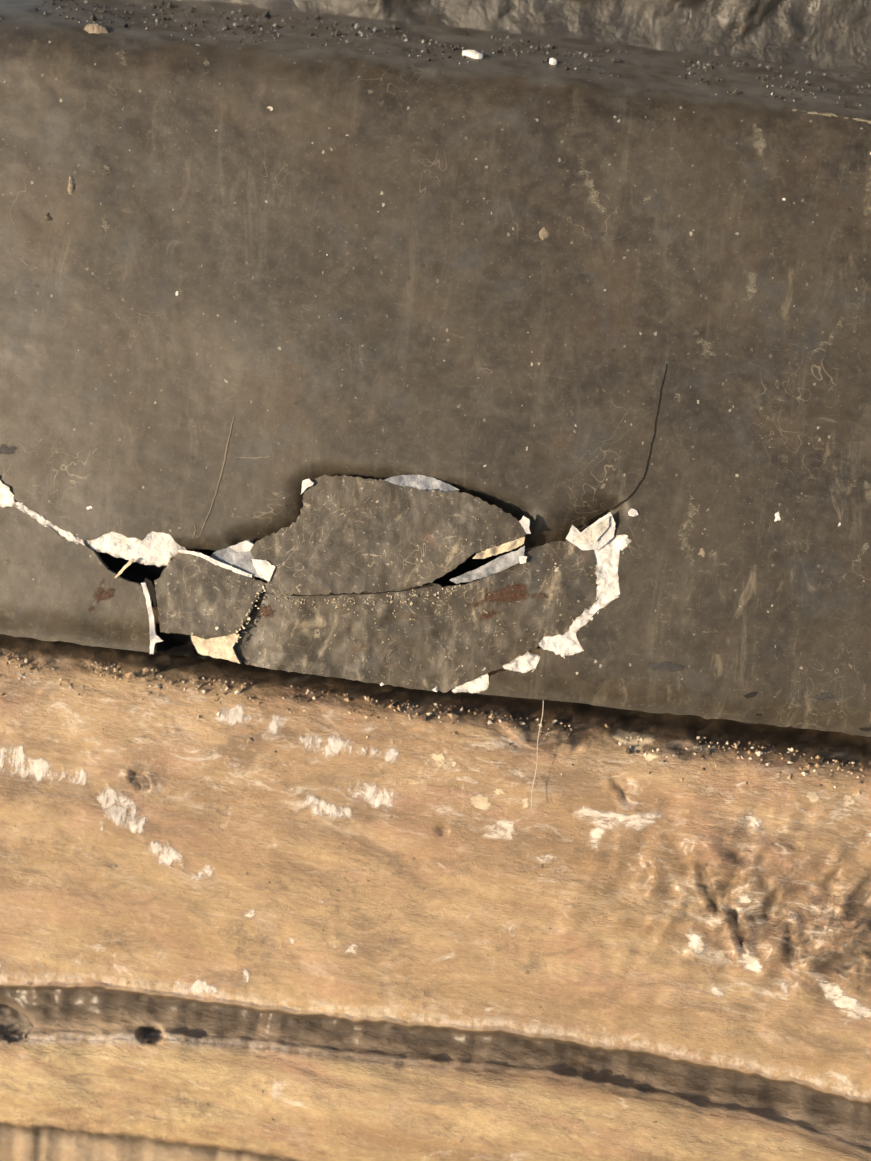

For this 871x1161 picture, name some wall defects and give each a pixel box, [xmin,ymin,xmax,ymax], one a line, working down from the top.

crack [576,363,668,529]
crack [141,578,163,654]
peeling [0,480,631,693]
crack [267,583,455,620]